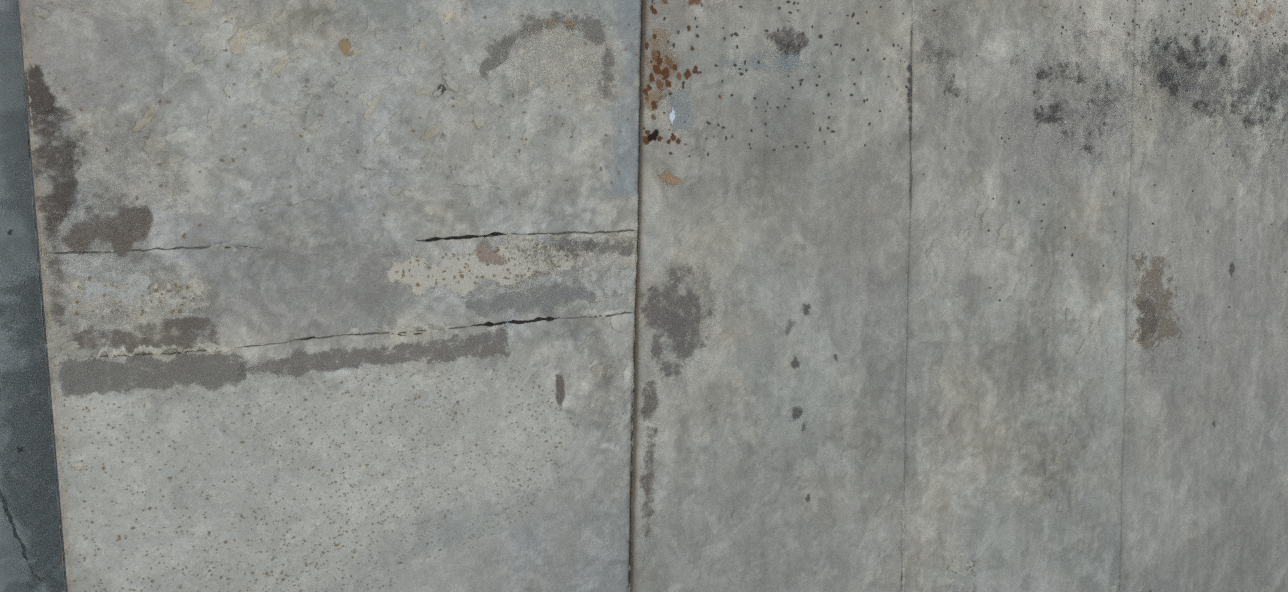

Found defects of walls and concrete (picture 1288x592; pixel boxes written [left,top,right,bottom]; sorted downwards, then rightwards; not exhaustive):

corrosion [1110,0,1287,56]
corrosion [618,0,733,157]
corrosion [749,25,881,151]
damp [1034,102,1066,133]
damp [1148,36,1227,95]
crack [417,229,638,242]
corrosion [49,260,200,326]
crack [84,309,632,361]
corrosion [395,243,580,288]
damp [642,270,711,376]
damp [1131,253,1180,357]